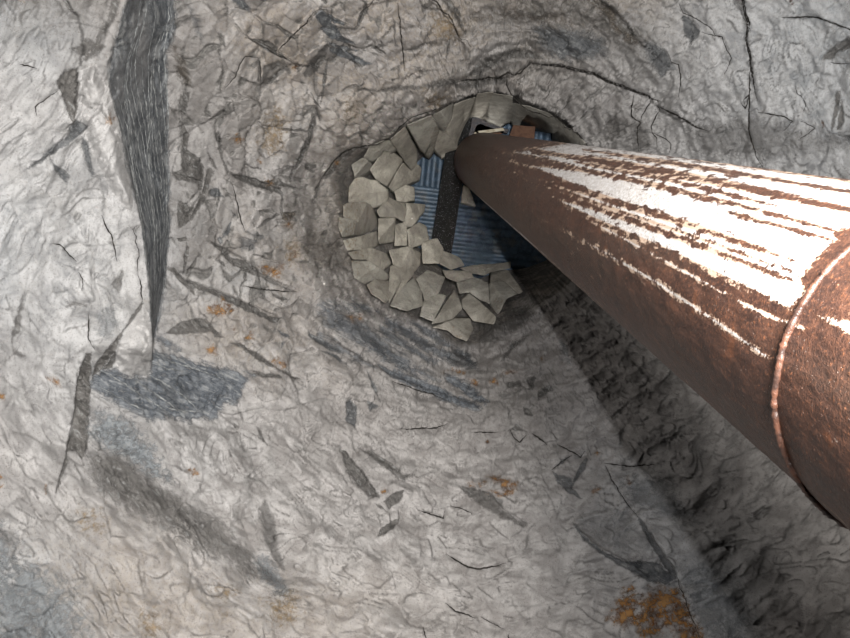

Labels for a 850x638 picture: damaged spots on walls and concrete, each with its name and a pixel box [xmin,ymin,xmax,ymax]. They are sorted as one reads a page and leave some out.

crack [225,10,318,88]
crack [397,3,405,71]
crack [433,0,471,47]
crack [782,16,850,30]
crack [679,0,815,167]
rust [606,586,703,638]